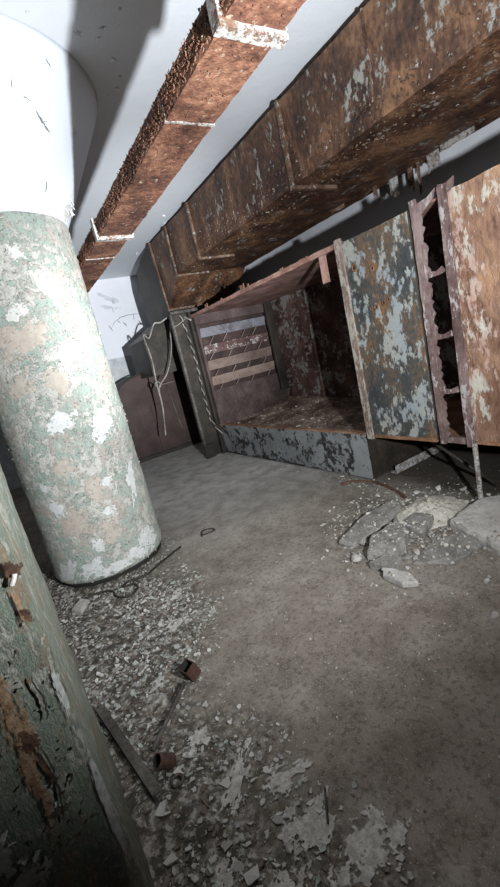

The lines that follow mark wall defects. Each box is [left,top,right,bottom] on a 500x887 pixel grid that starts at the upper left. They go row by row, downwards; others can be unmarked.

peeling [5,243,61,307]
peeling [4,302,29,322]
peeling [44,401,115,444]
peeling [39,483,68,519]
peeling [125,449,137,512]
corrosion [2,561,35,623]
corrosion [0,677,63,839]